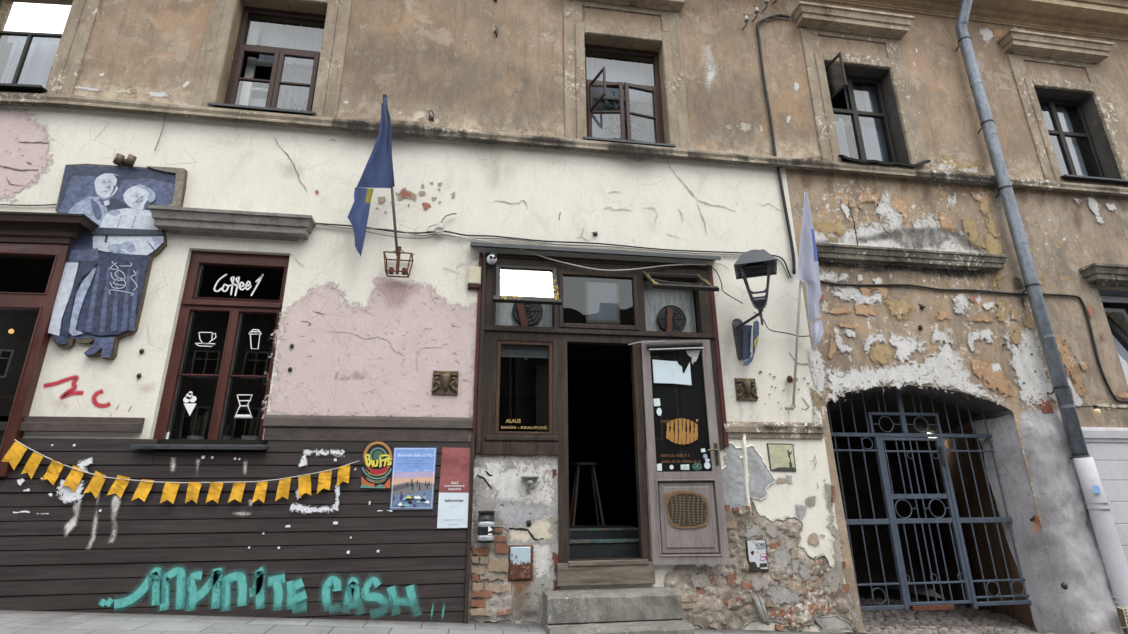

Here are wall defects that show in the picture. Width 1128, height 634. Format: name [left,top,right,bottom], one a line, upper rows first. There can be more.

crack [0,141,48,186]
peeling [376,182,455,214]
crack [604,159,782,239]
peeling [813,152,1006,255]
peeling [1073,195,1116,224]
peeling [759,268,1058,423]
peeling [1054,327,1128,410]
spalling [469,513,559,623]
spalling [663,441,857,632]